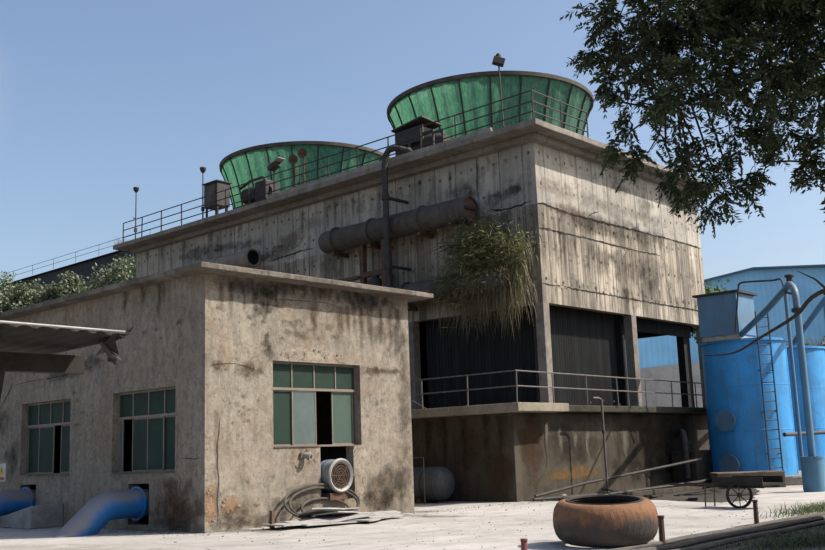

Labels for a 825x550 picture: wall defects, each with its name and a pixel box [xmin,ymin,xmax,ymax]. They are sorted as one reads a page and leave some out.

crack [182,421,225,522]